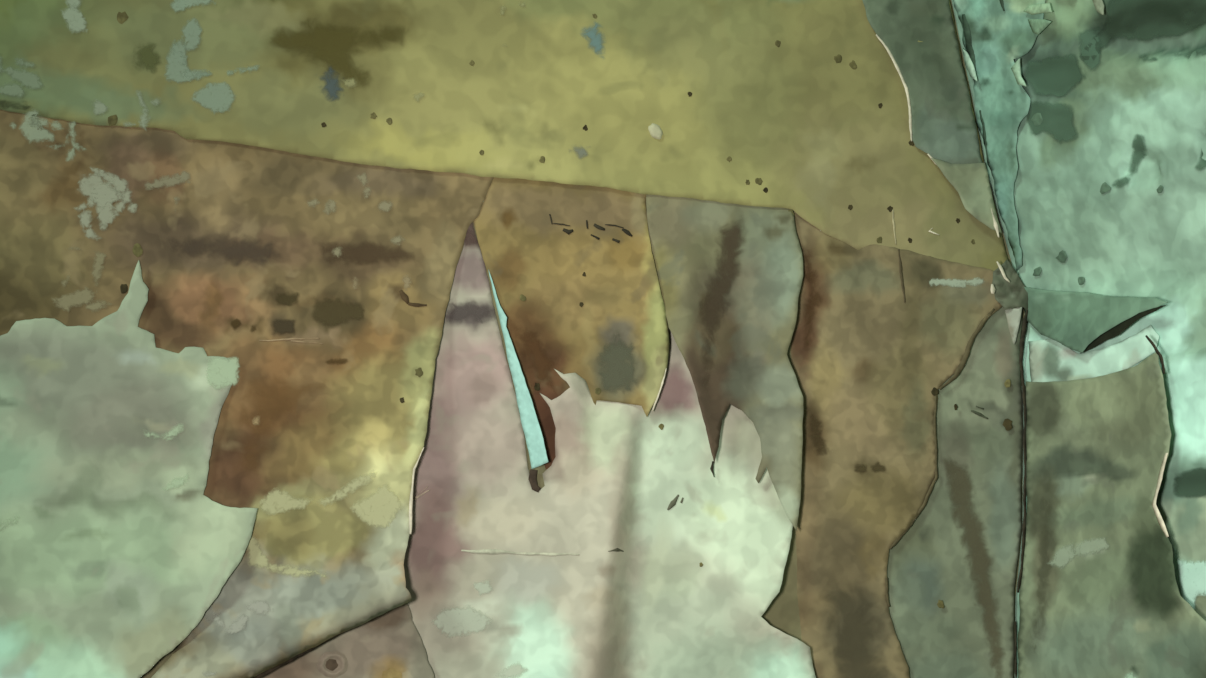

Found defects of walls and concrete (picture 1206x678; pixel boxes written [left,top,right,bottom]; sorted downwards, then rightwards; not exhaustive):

peeling [63,0,86,31]
peeling [166,0,257,112]
leakage [274,26,401,100]
peeling [11,111,79,160]
spalling [953,0,1052,276]
peeling [75,168,137,238]
peeling [53,253,105,311]
peeling [207,358,239,388]
flaking render [1028,325,1159,382]
crack [885,308,995,607]
peeling [260,473,400,528]
crack [1014,310,1028,678]